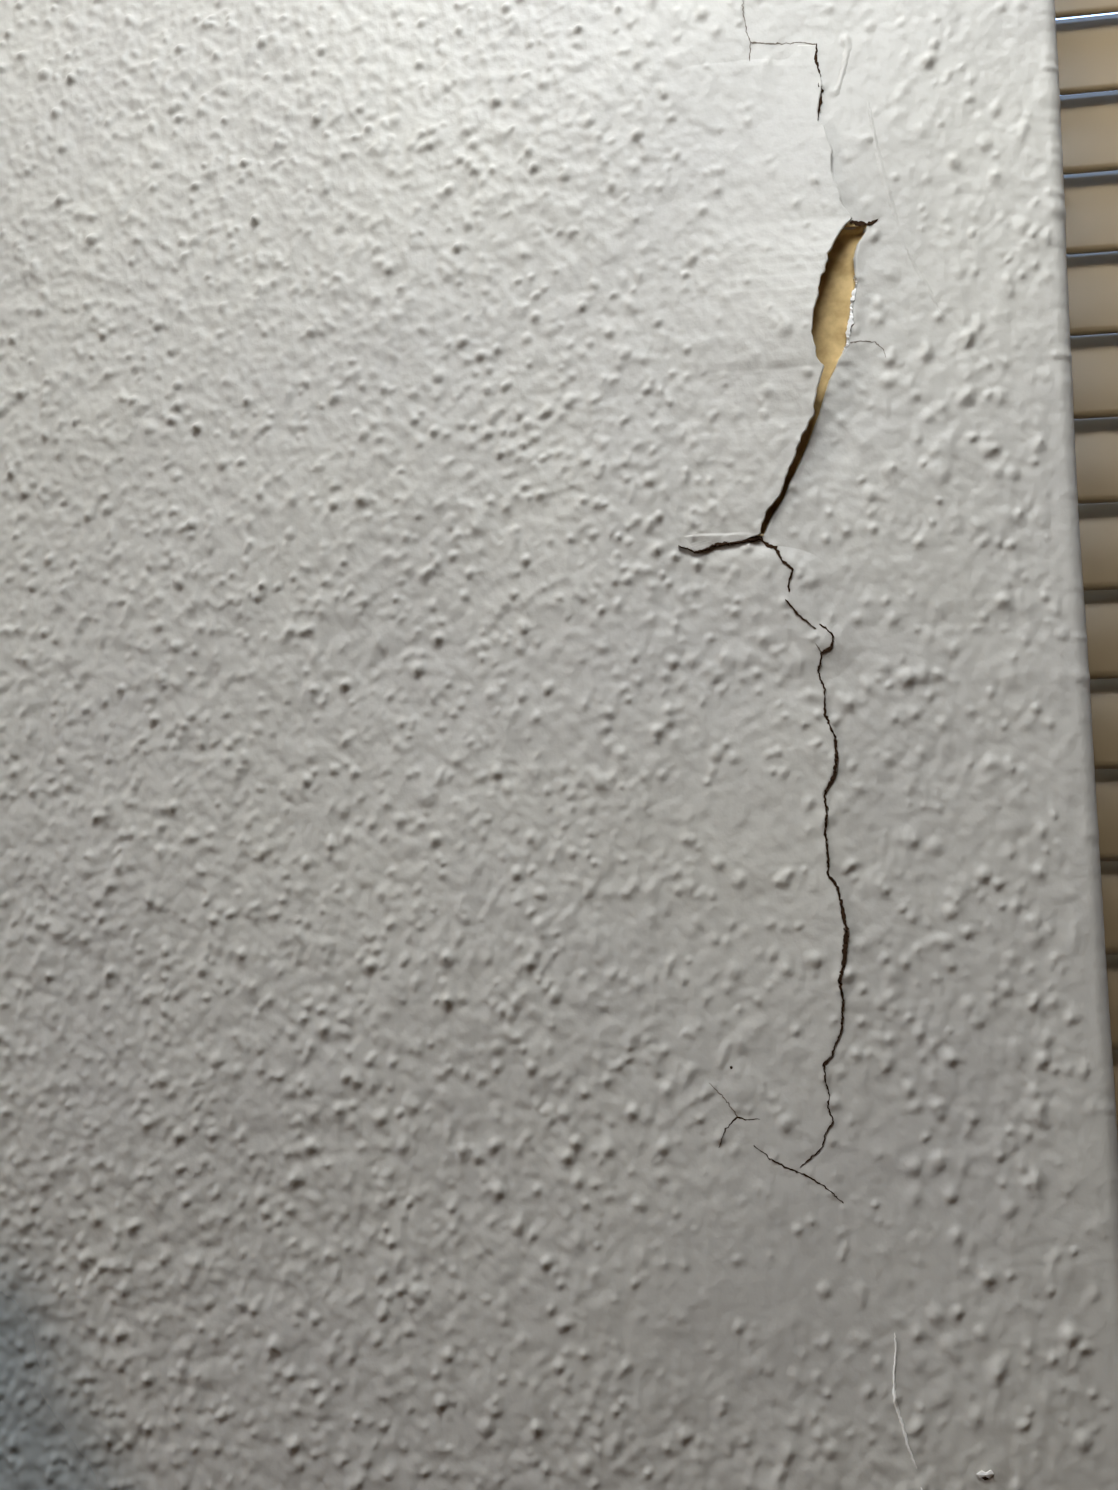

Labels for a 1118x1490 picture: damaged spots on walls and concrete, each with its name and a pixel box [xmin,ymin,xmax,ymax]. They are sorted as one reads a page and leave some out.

crack [741,2,824,120]
crack [850,218,878,226]
crack [678,535,849,1203]